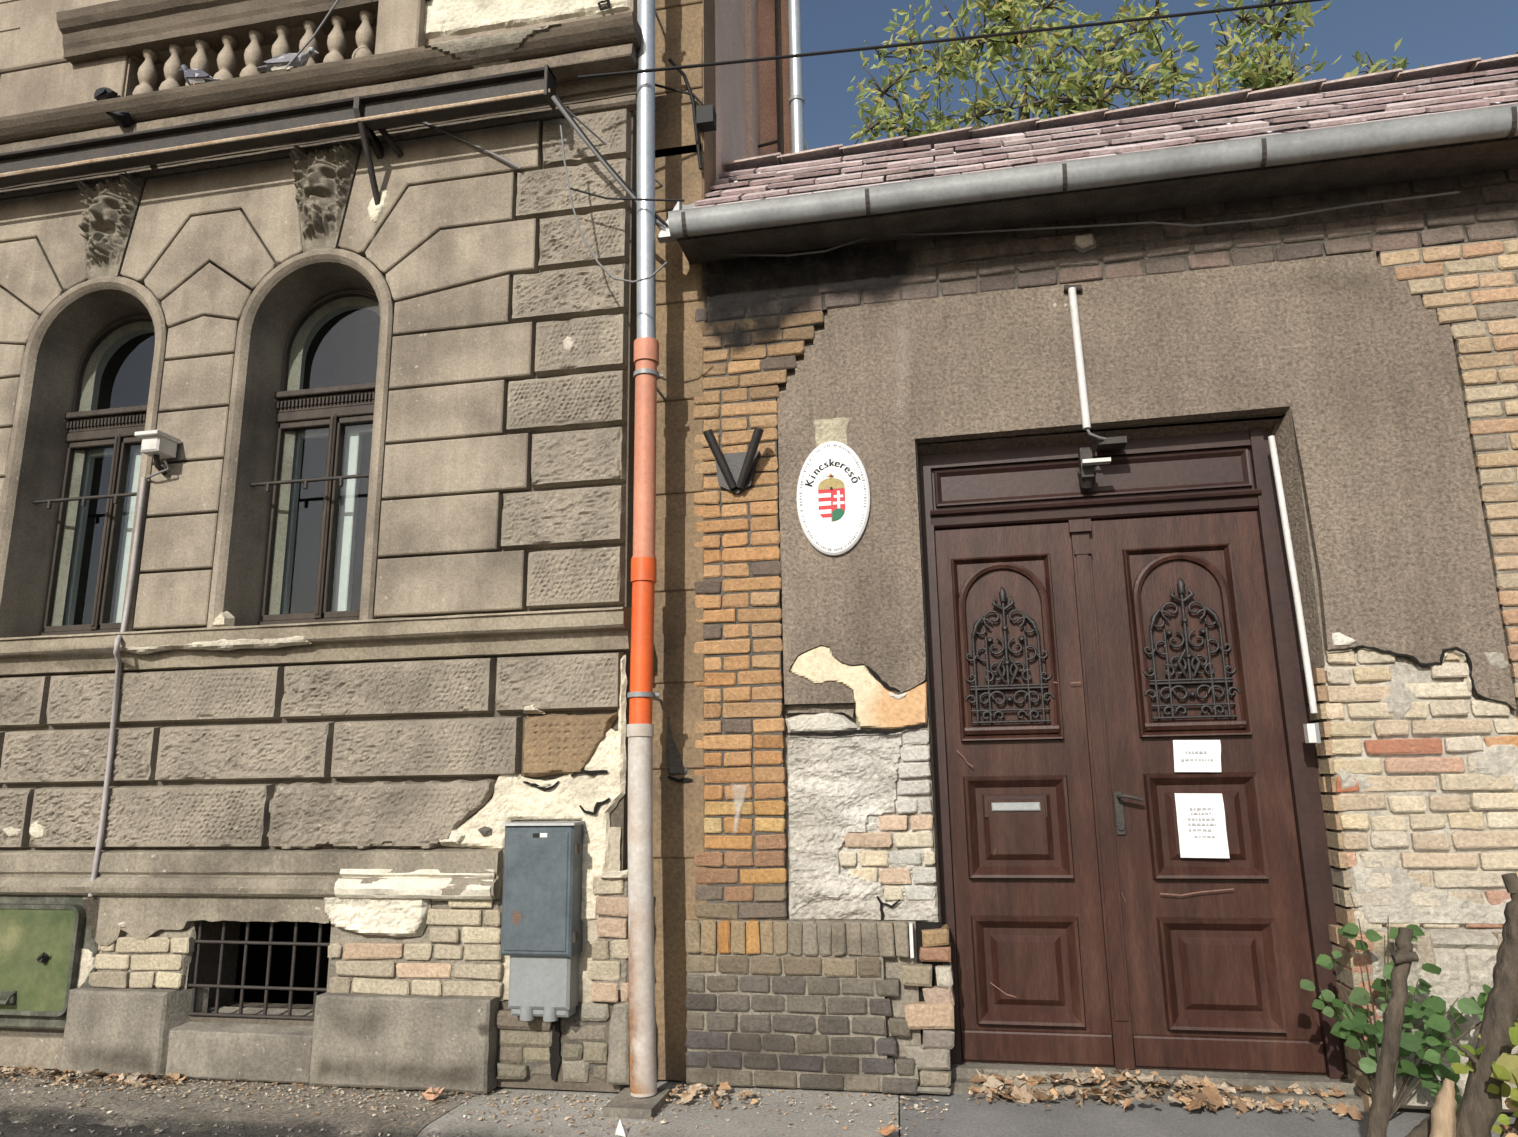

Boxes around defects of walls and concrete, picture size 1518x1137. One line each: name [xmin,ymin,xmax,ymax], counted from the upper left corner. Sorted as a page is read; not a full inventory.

flaking render [77,922,196,989]
flaking render [324,897,504,1001]
flaking render [439,654,630,1085]
flaking render [786,646,955,1095]
flaking render [1306,632,1518,1113]